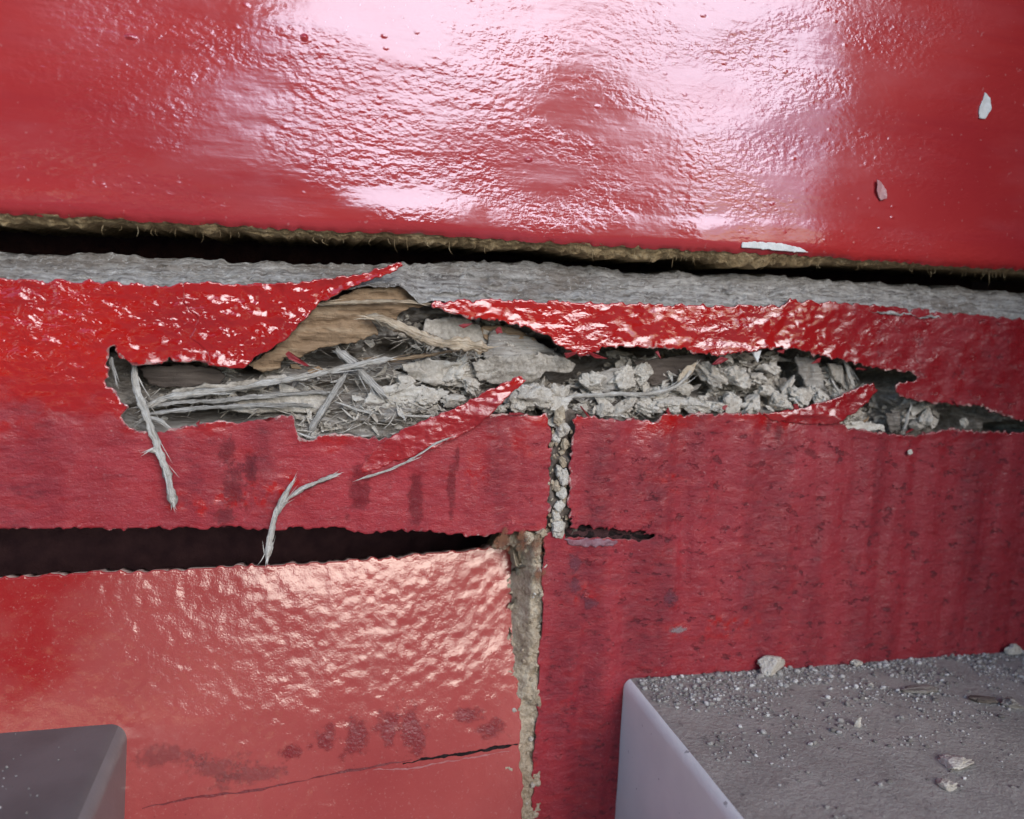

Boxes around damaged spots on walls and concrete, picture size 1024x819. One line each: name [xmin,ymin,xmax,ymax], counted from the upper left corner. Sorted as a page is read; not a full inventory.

peeling [140,262,729,482]
peeling [751,349,940,434]
crack [542,405,655,548]
crack [142,744,518,809]